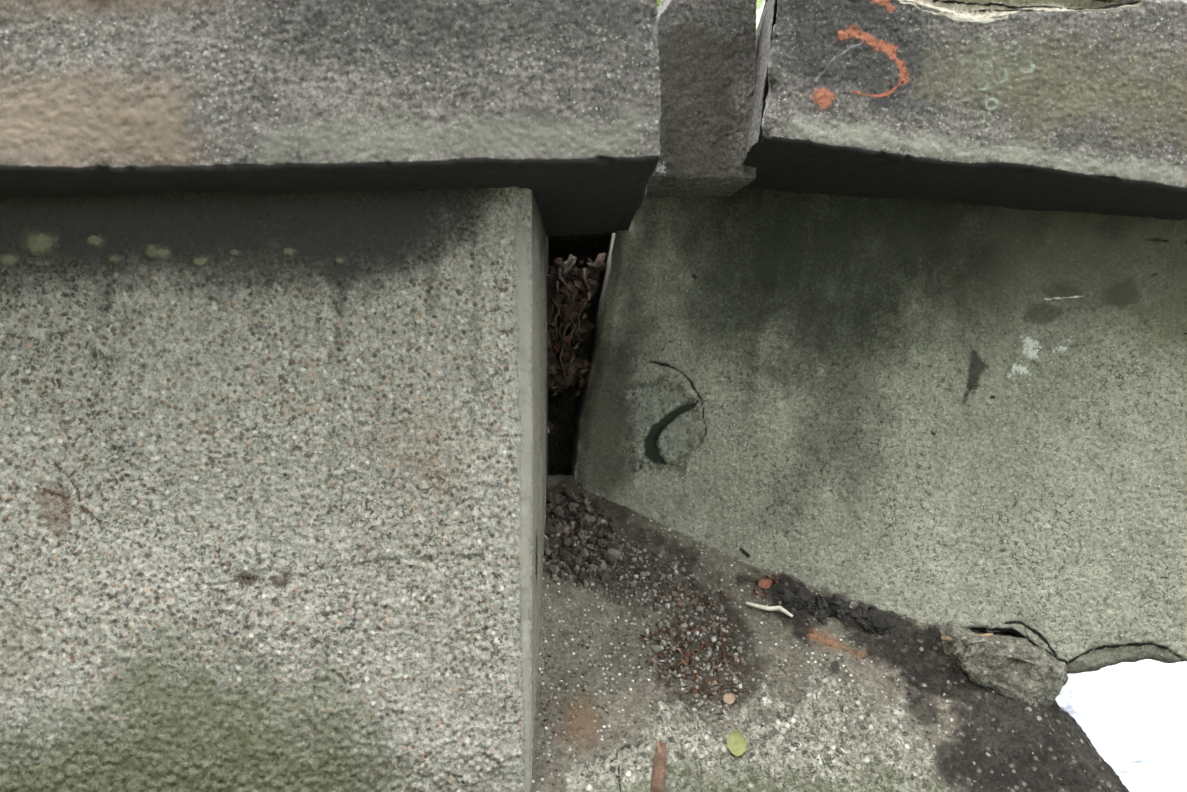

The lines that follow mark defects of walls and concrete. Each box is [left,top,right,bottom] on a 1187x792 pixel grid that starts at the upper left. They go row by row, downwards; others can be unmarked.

spalling [898,0,1144,23]
water stain [675,185,994,379]
crack [971,621,1185,665]